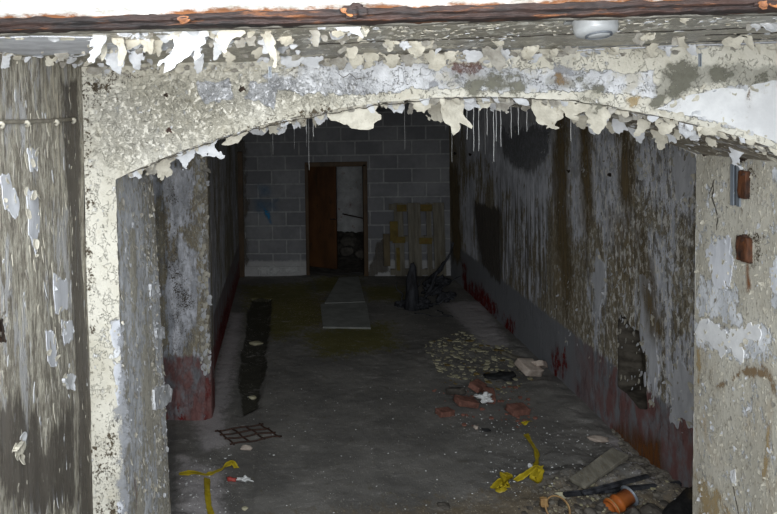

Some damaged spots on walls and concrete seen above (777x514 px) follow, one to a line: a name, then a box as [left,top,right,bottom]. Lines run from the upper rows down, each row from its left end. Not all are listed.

damp [0,66,143,514]
flaking render [110,80,777,514]
damp [449,165,460,263]
damp [475,202,501,284]
damp [501,115,572,305]
damp [581,128,591,230]
damp [621,146,632,206]
peeling [12,429,30,465]